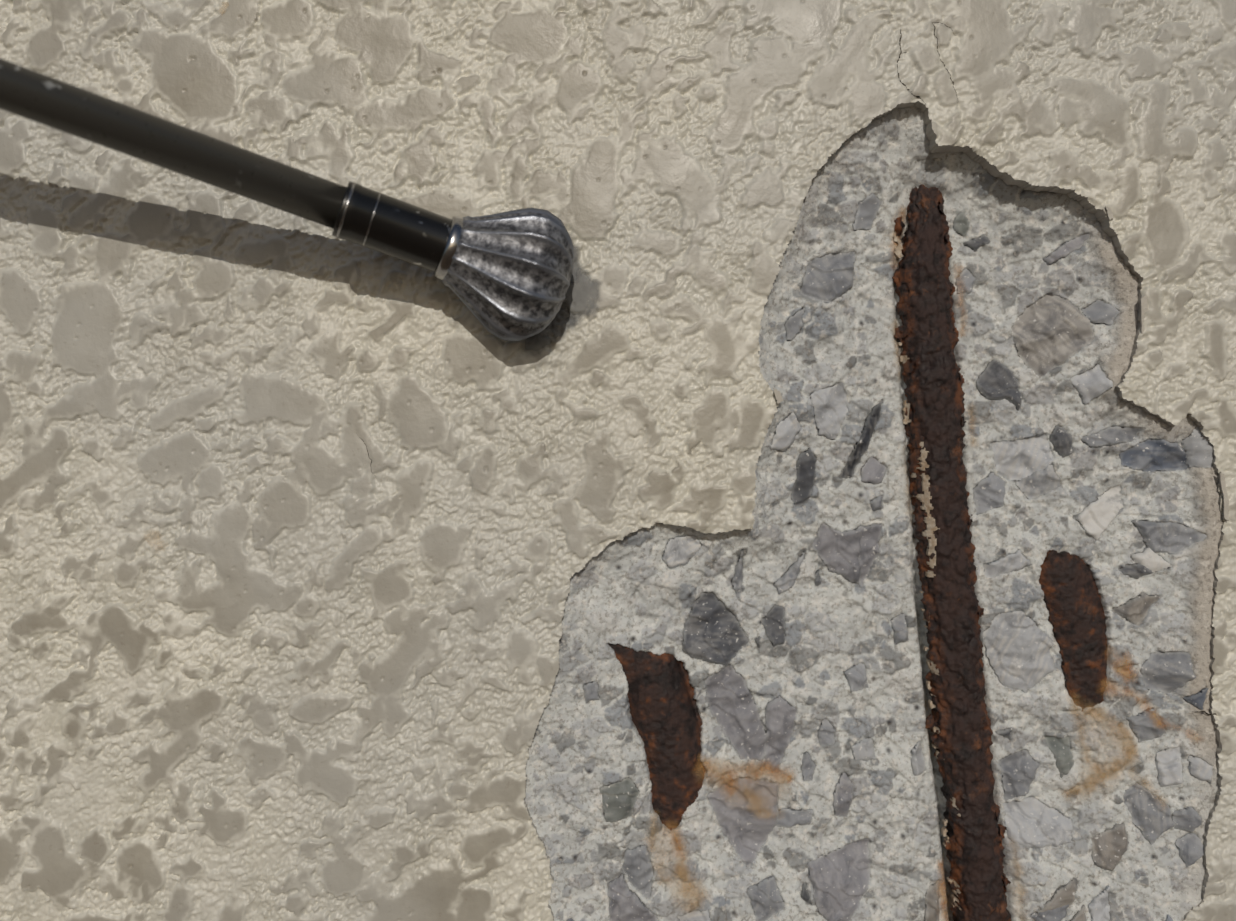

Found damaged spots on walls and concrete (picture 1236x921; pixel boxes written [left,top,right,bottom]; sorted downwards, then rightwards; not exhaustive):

rust [894,217,905,243]
rust [892,268,912,288]
rust [893,303,911,342]
spalling [524,101,1229,921]
rust [925,714,944,745]
rust [995,810,1007,844]